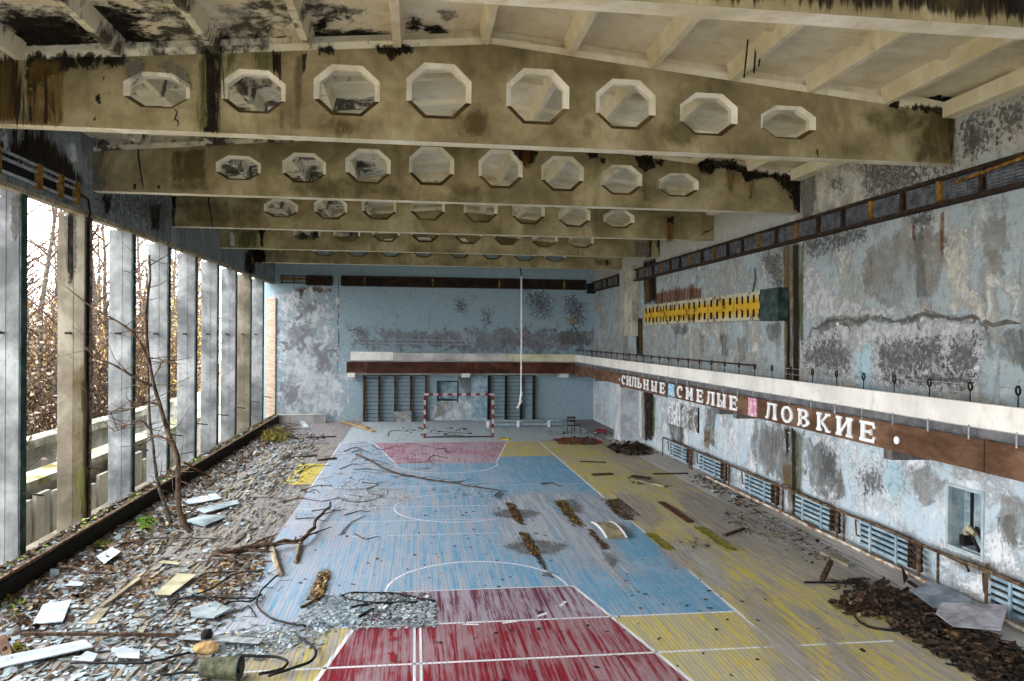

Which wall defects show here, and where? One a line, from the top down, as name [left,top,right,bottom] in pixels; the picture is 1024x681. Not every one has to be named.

damp [197,36,236,134]
damp [295,9,415,87]
damp [799,0,1024,24]
damp [0,1,211,249]
crack [136,149,144,190]
peeling [265,283,369,421]
crack [808,311,1021,337]